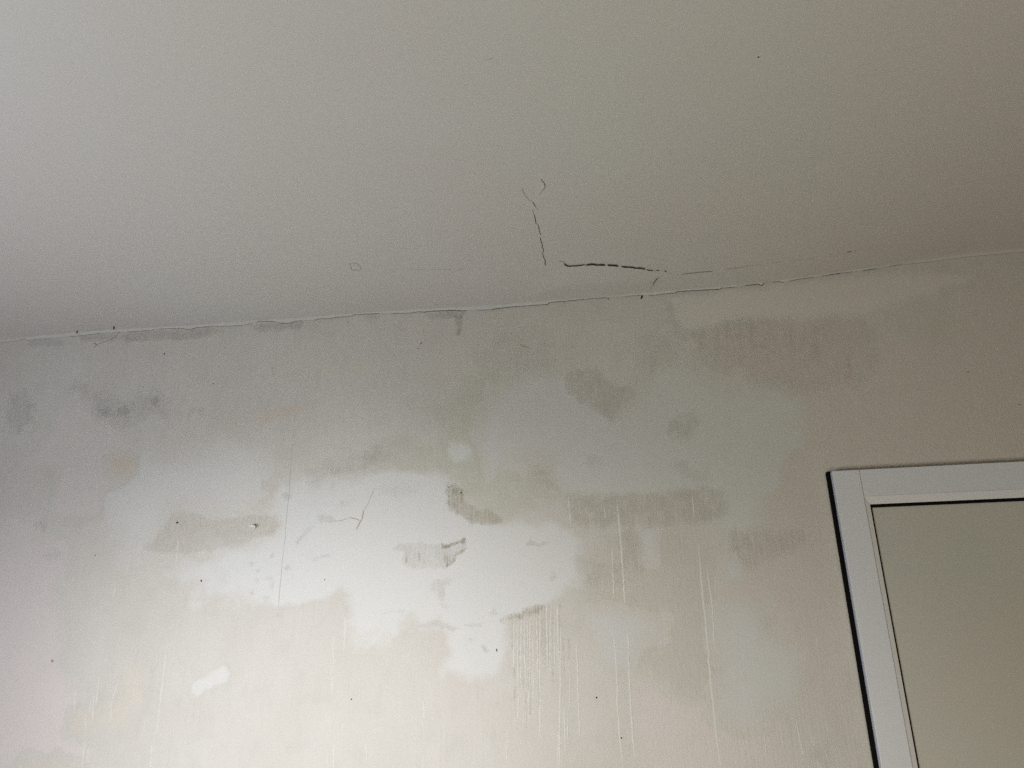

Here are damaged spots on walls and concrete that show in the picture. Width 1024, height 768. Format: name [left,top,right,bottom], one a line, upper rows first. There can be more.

crack [521,181,902,296]